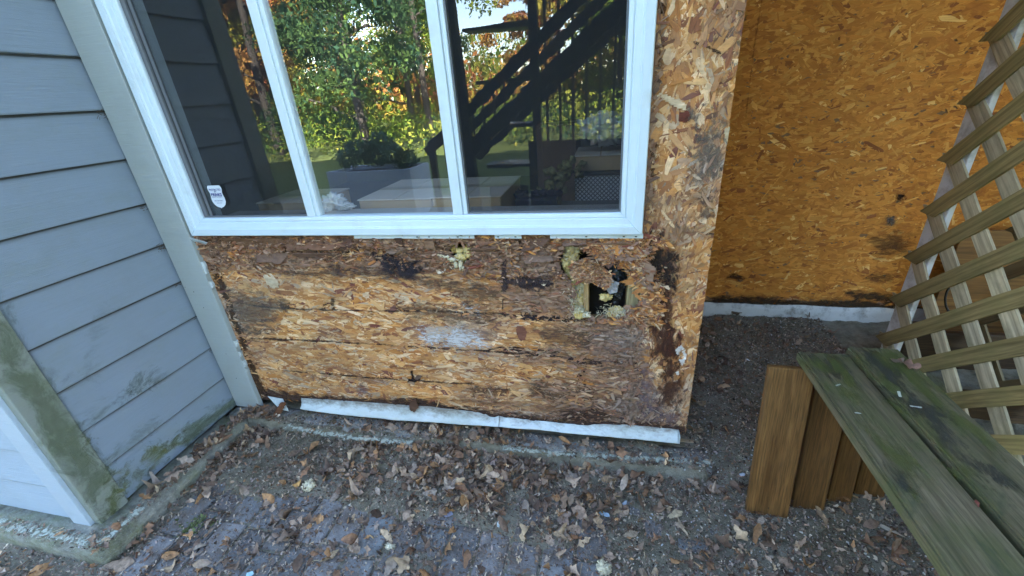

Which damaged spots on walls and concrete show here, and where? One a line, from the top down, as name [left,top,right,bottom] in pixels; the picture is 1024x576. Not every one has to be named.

water stain [201,240,290,397]
water stain [284,247,603,367]
peeling [449,238,499,276]
spalling [518,238,656,323]
water stain [644,231,679,295]
water stain [395,397,463,410]
water stain [469,339,680,426]